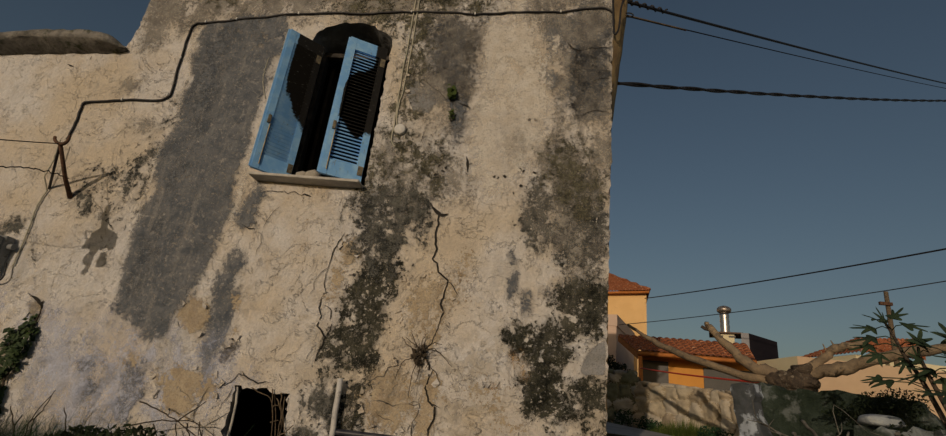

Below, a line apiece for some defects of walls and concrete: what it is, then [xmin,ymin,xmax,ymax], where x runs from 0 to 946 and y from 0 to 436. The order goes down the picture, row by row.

damp [70,0,489,436]
crack [353,202,458,436]
damp [497,0,613,436]